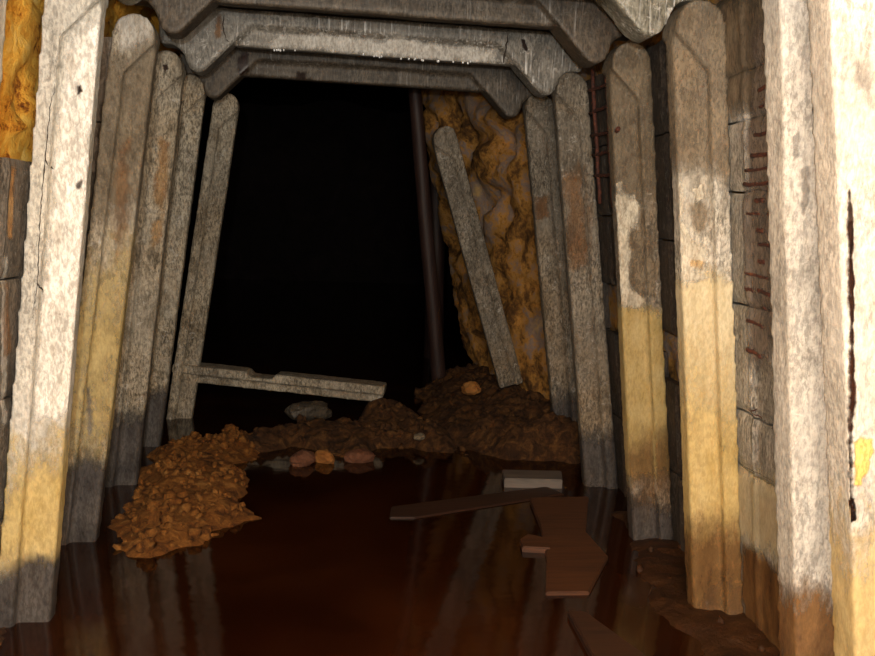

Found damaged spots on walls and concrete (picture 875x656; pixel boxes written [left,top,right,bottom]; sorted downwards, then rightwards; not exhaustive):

damp [271,35,493,62]
damp [602,56,657,193]
damp [662,0,764,179]